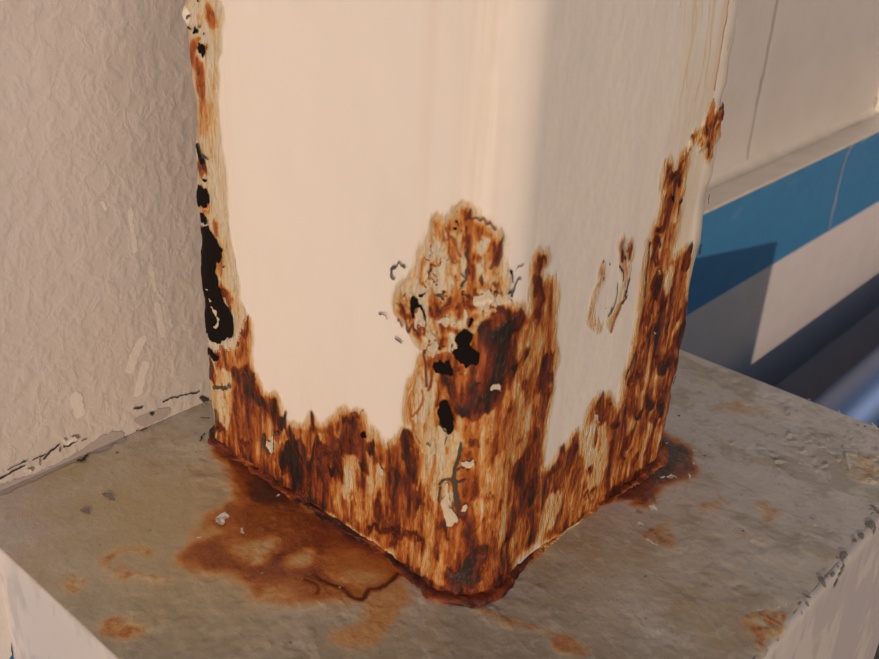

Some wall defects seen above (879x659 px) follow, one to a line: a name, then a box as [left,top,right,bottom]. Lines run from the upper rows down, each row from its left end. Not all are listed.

crack [747,0,778,160]
corrosion [161,0,709,659]
peeling [0,431,127,495]
spalling [851,505,879,542]
spalling [818,551,848,588]